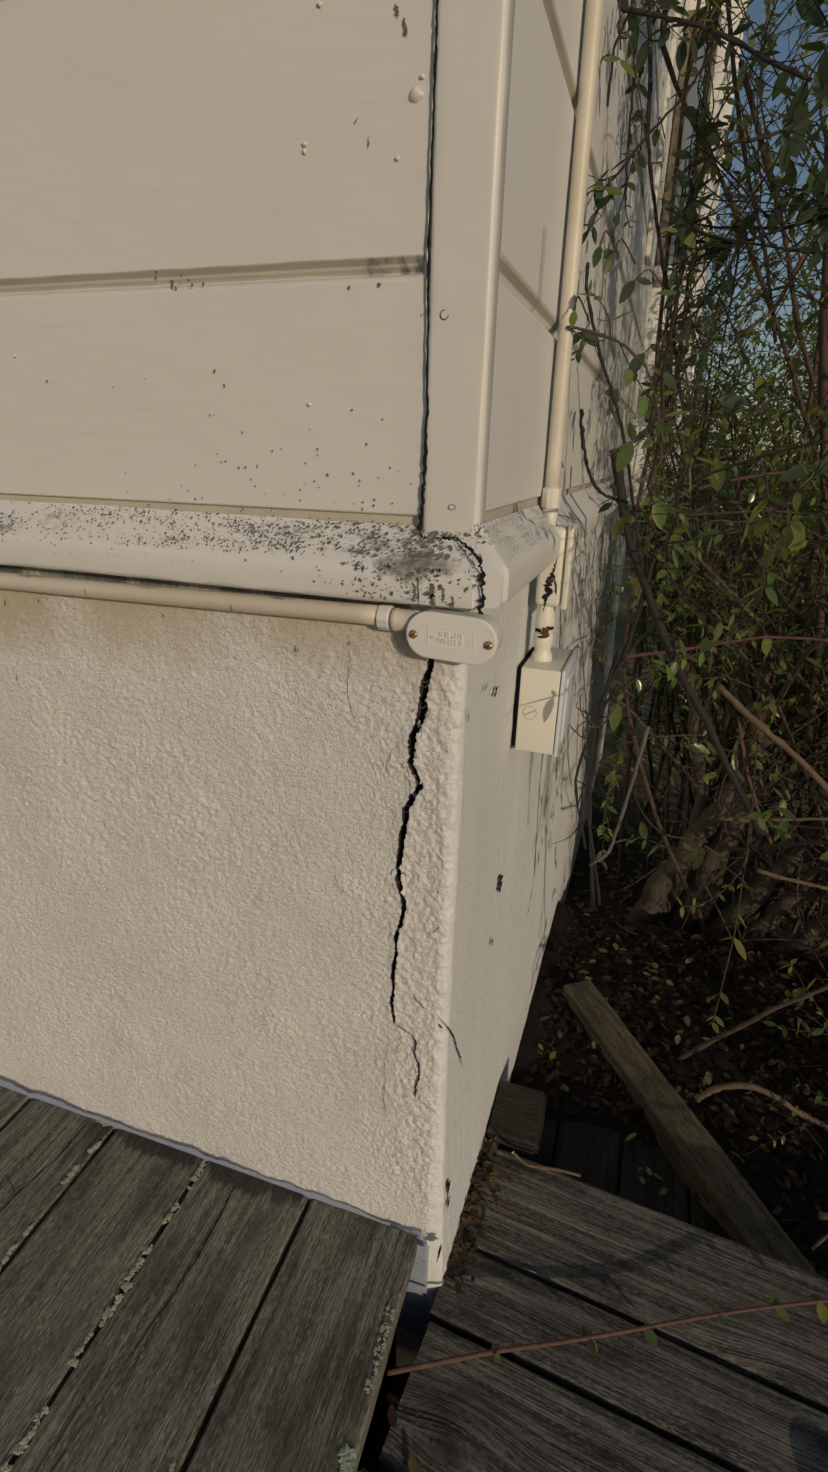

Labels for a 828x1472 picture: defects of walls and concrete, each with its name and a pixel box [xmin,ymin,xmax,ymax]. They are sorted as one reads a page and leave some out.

water stain [0,501,554,613]
crack [383,658,462,1119]